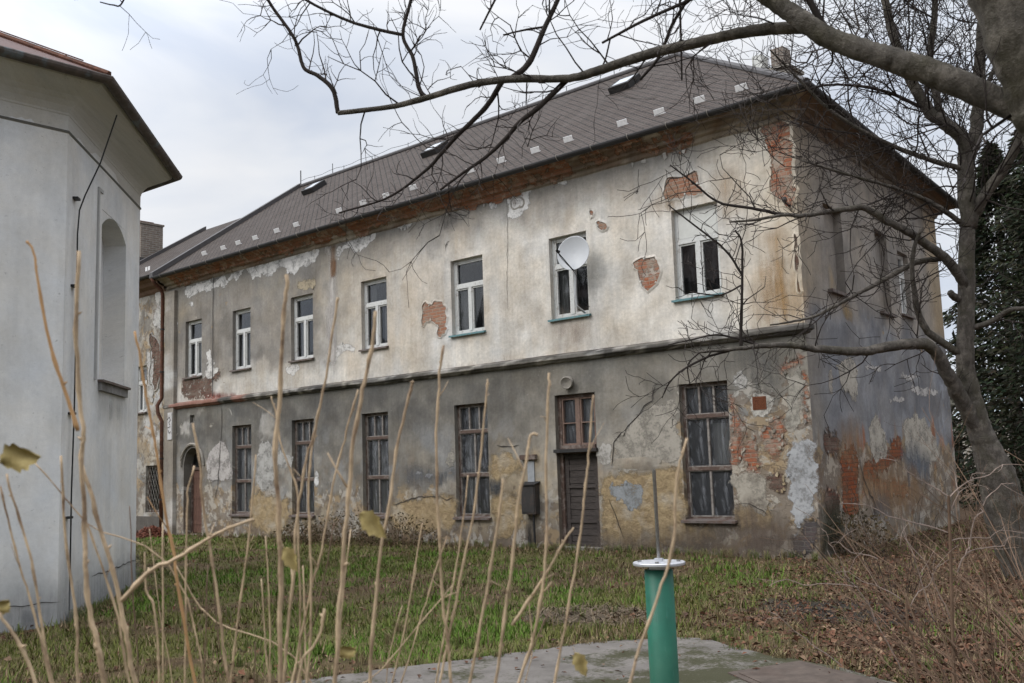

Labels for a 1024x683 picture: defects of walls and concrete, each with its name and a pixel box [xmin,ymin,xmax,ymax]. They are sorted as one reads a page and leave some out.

peeling [483,190,531,219]
flaking render [588,207,610,233]
flaking render [661,168,706,203]
flaking render [758,121,800,212]
peeling [336,233,376,260]
peeling [185,249,319,307]
flaking render [631,254,663,294]
flaking render [420,299,449,339]
peeling [147,292,161,402]
peeling [205,441,233,482]
flaking render [596,399,716,551]
peeling [729,355,939,556]